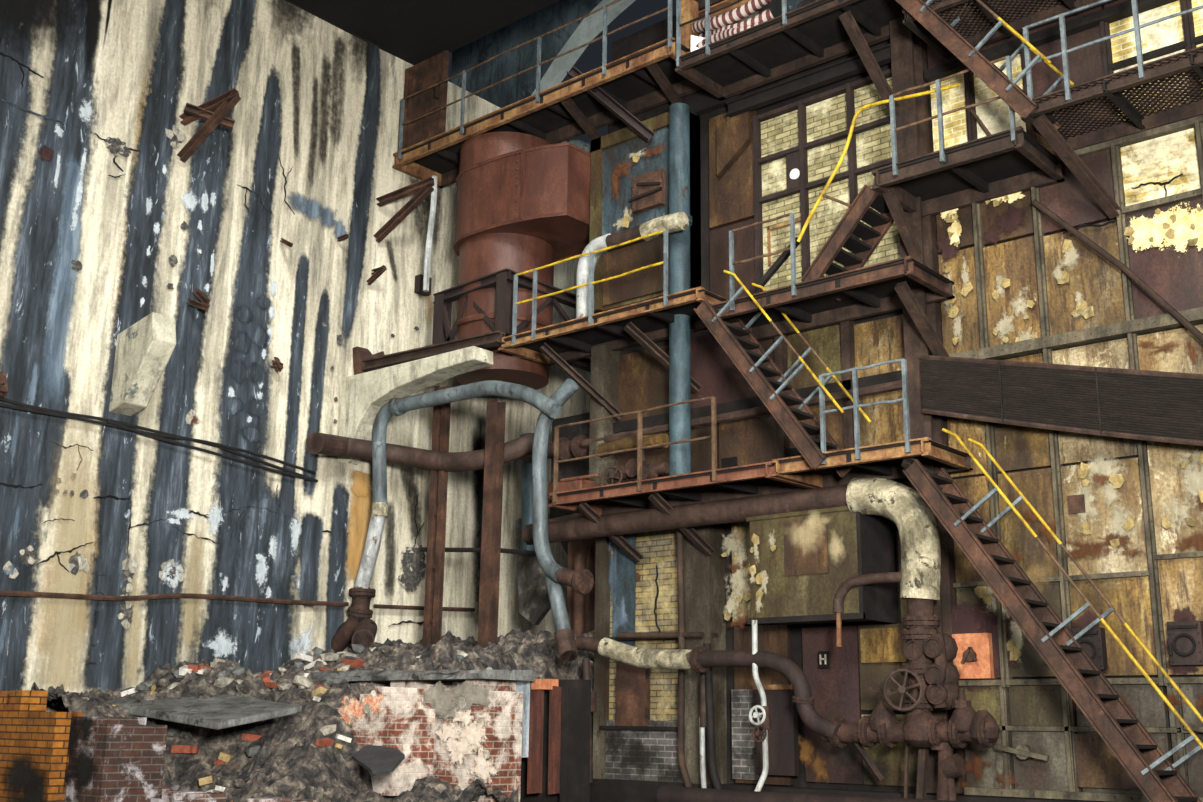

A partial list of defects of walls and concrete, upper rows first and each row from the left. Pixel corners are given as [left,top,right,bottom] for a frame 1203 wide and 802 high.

peeling [1124,202,1203,254]
peeling [1054,239,1094,319]
water stain [0,0,381,692]
crack [38,518,92,572]
crack [94,485,351,559]
water stain [385,503,395,594]
water stain [403,469,421,541]
crack [653,565,661,632]
peeling [721,526,776,621]
corrosion [1066,533,1139,559]
corrosion [1175,533,1203,552]
spalling [336,680,497,796]